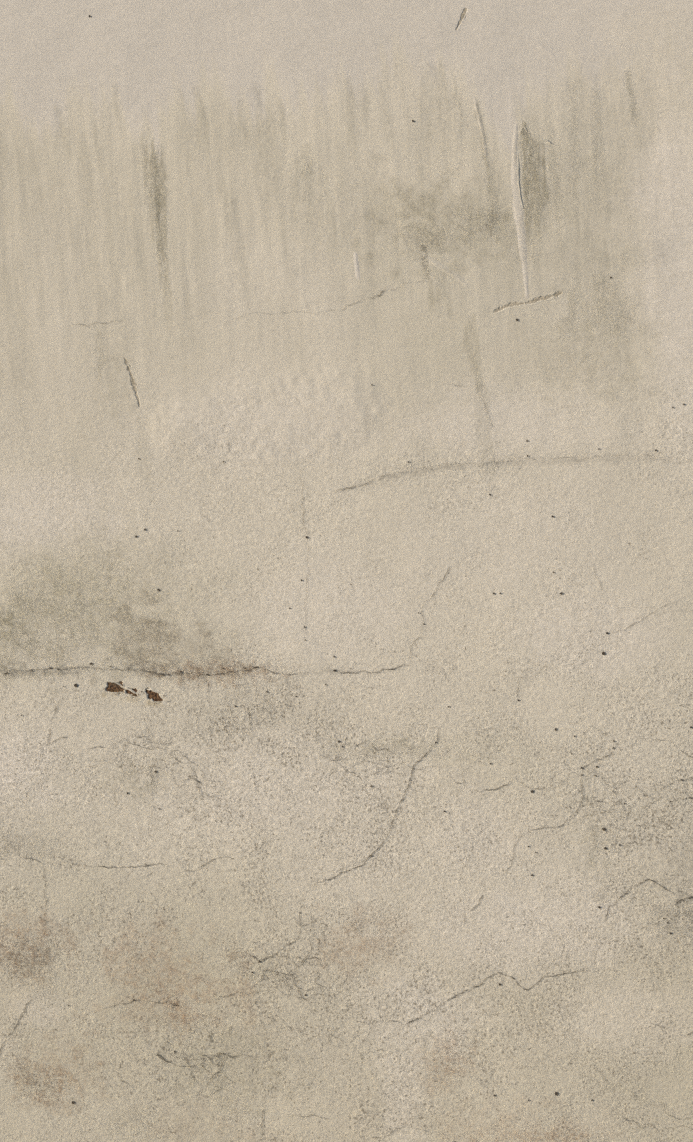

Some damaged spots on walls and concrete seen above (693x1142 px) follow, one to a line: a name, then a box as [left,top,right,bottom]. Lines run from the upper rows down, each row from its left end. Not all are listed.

crack [322,735,438,882]
crack [251,915,324,999]